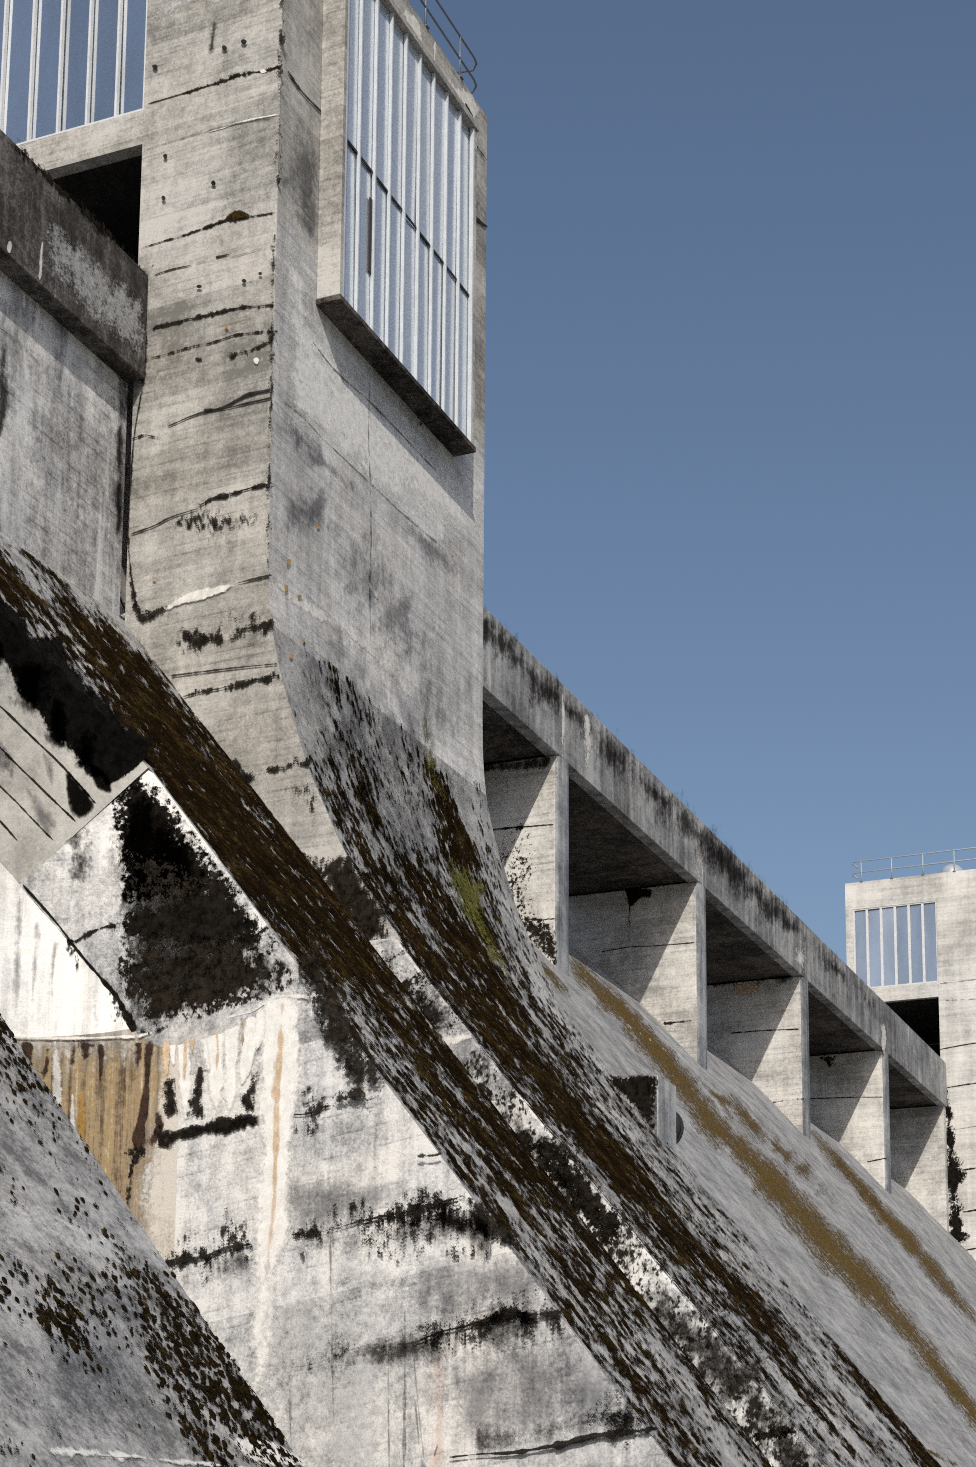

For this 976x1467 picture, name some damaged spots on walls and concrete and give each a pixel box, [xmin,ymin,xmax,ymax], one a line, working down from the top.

rust [21,1038,195,1221]
leakage [0,596,385,1405]
leakage [301,852,836,1467]
leakage [483,618,875,1010]
leakage [696,1075,890,1222]
leakage [946,1090,970,1243]